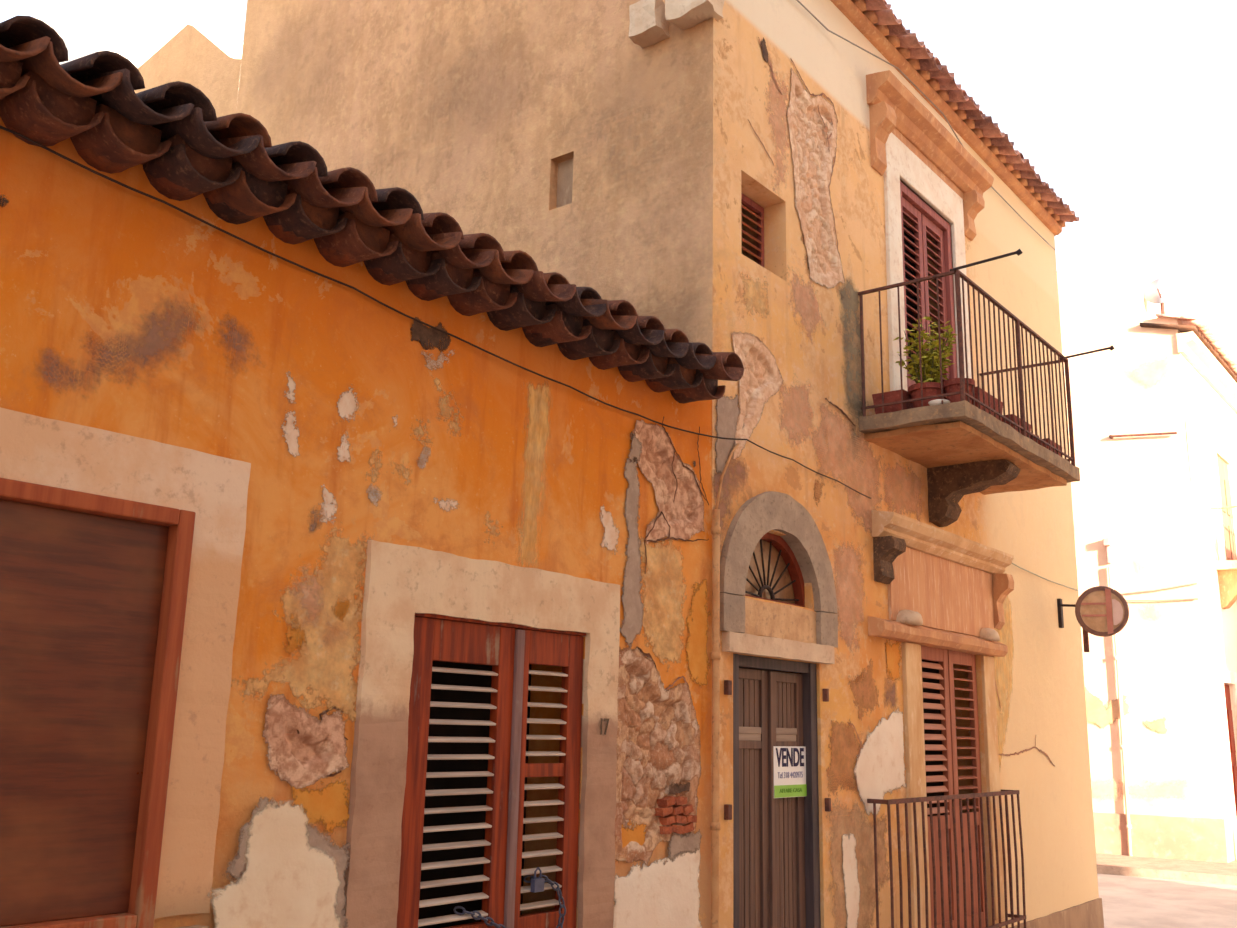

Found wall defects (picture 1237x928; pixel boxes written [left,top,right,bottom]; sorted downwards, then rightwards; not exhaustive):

spalling [767,68,844,340]
mould [43,305,195,385]
peeling [281,373,300,457]
peeling [337,387,359,462]
spalling [366,317,459,507]
peeling [433,497,458,512]
peeling [732,331,921,533]
flaking render [211,485,371,928]
spalling [613,419,710,928]
peeling [826,640,907,928]
peeling [1085,687,1129,729]
peeling [1145,718,1167,733]